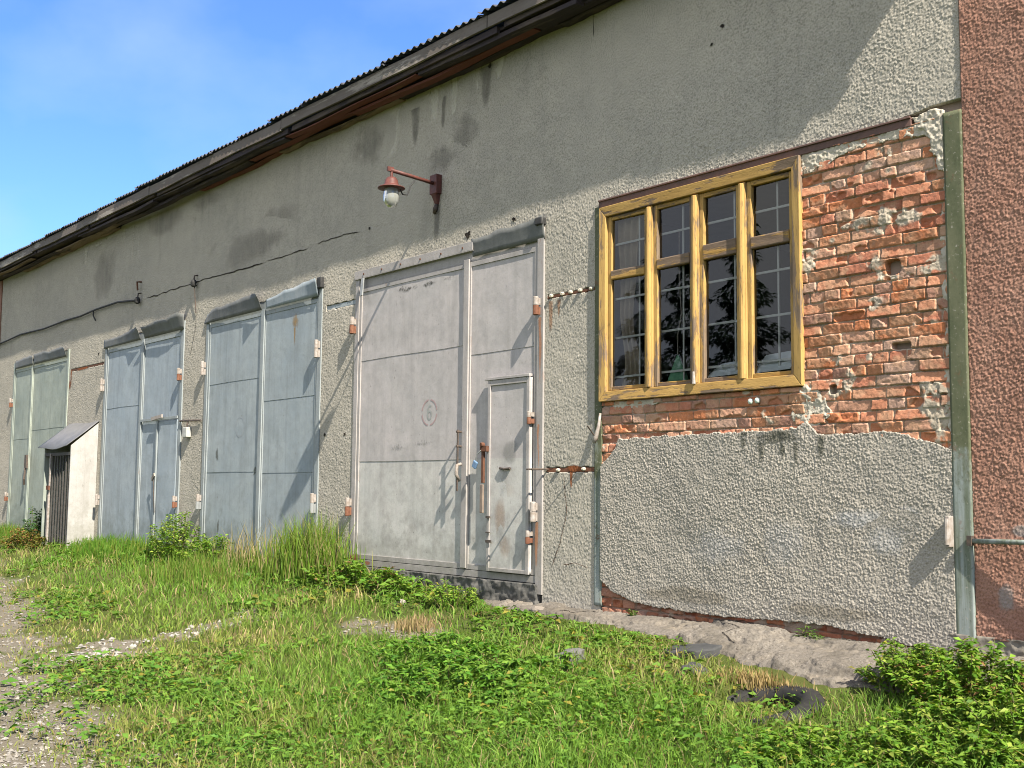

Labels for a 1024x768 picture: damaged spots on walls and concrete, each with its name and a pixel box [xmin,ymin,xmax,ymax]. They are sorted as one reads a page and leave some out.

flaking render [546,108,951,472]
water stain [765,431,797,457]
flaking render [601,582,914,647]